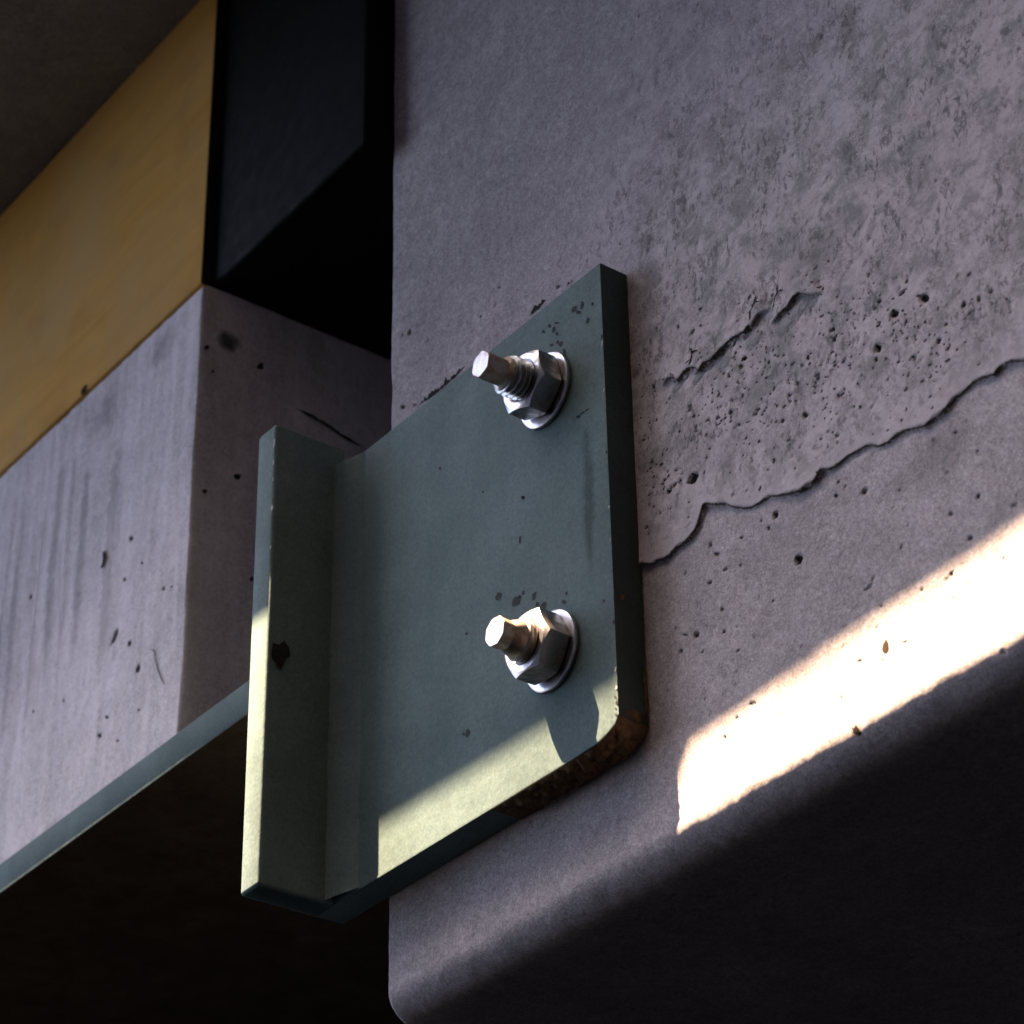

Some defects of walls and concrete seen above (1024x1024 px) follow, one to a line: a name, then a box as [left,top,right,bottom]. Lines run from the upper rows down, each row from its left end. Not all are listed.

crack [748,286,784,319]
spalling [653,313,762,391]
crack [296,408,363,447]
spalling [643,359,1024,566]